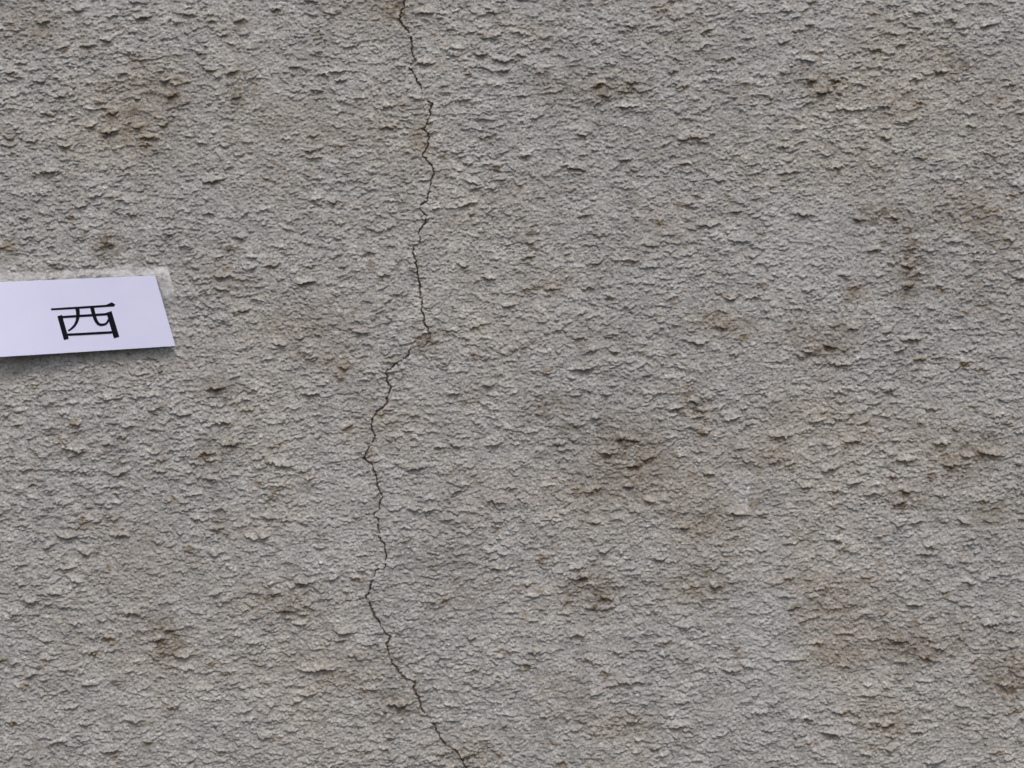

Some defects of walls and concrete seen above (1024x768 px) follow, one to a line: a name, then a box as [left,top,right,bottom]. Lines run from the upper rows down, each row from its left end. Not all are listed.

crack [336,1,467,768]